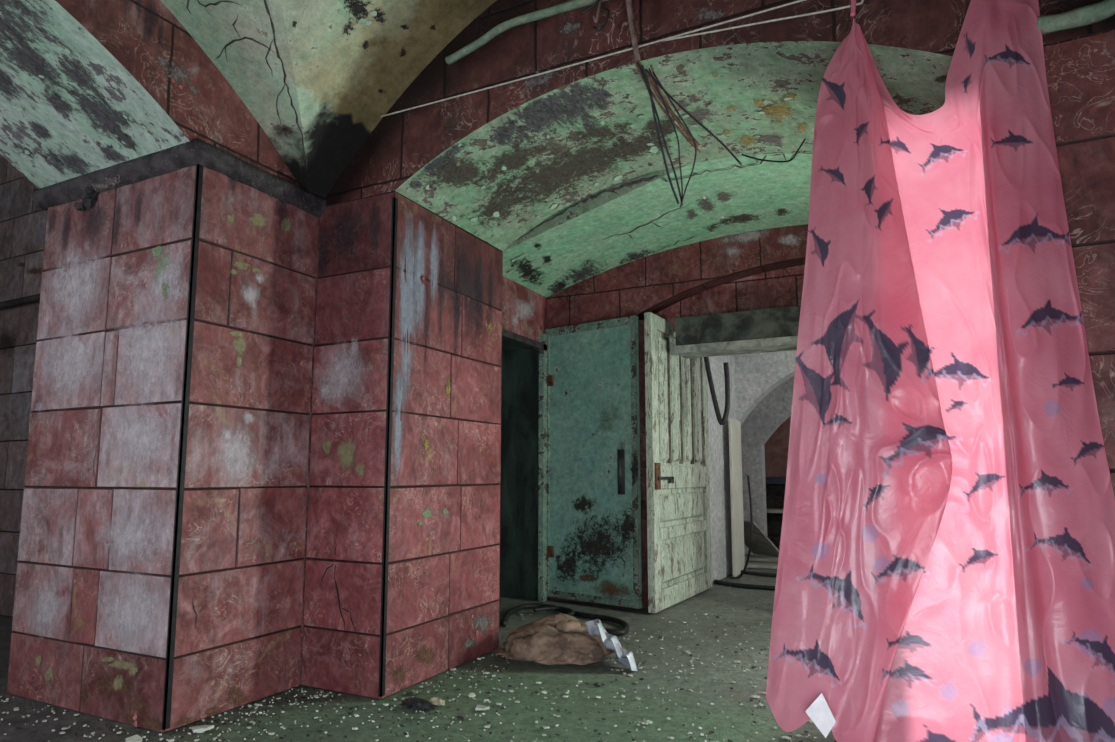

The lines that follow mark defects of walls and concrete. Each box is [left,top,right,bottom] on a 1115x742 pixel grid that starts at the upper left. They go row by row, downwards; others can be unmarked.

crack [186,0,307,169]
damp [487,80,625,148]
damp [548,250,655,294]
damp [394,228,438,469]
rust [579,575,644,601]